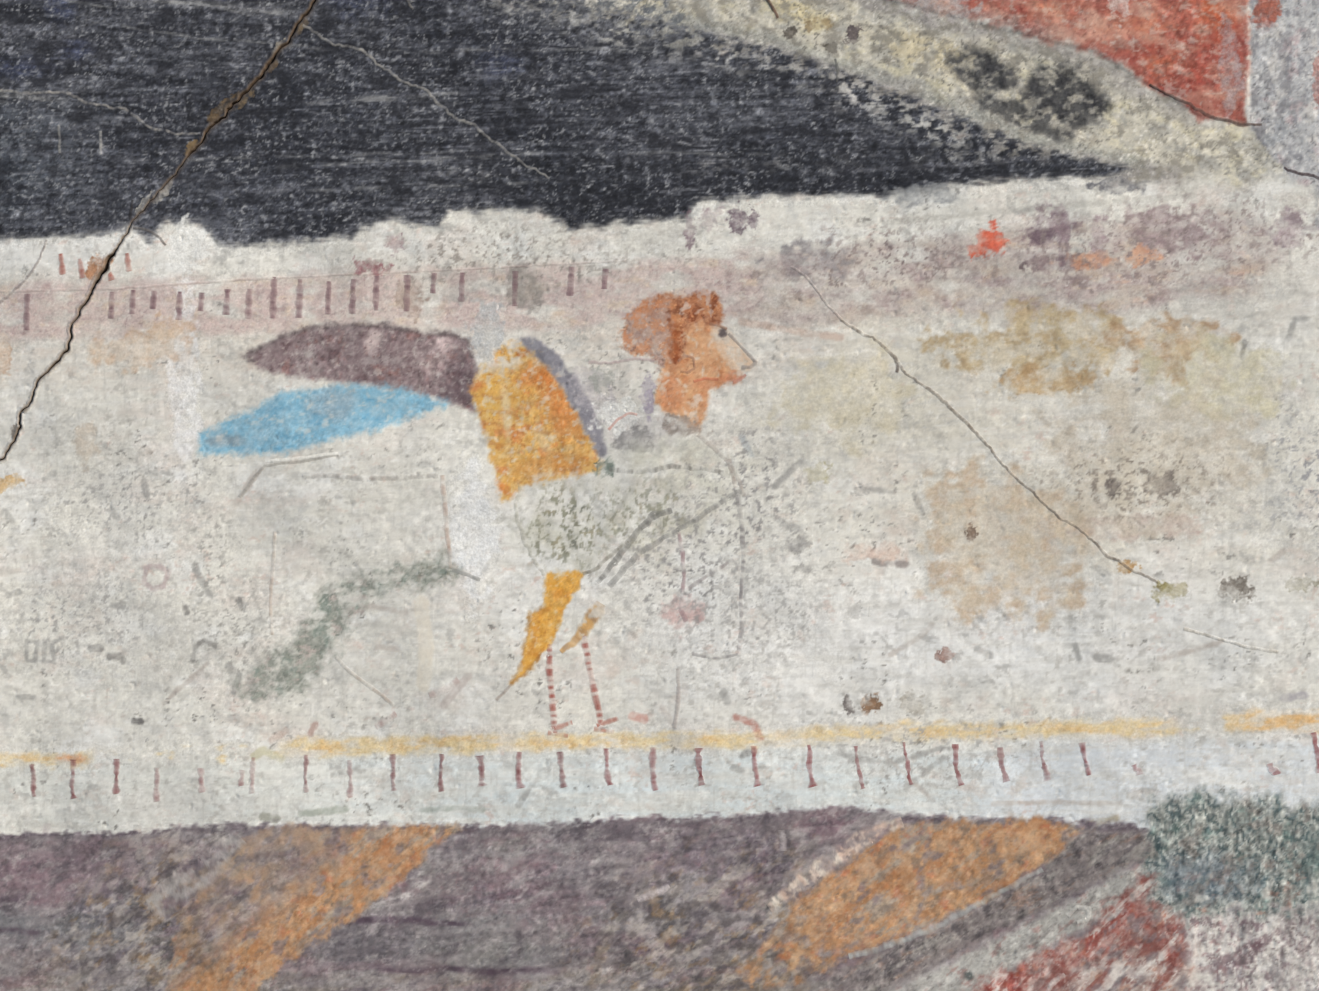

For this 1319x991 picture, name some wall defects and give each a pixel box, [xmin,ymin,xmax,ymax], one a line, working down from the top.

crack [1149,83,1262,127]
crack [1284,166,1319,180]
crack [0,0,550,465]
crack [790,266,1159,584]
crack [1183,627,1279,654]